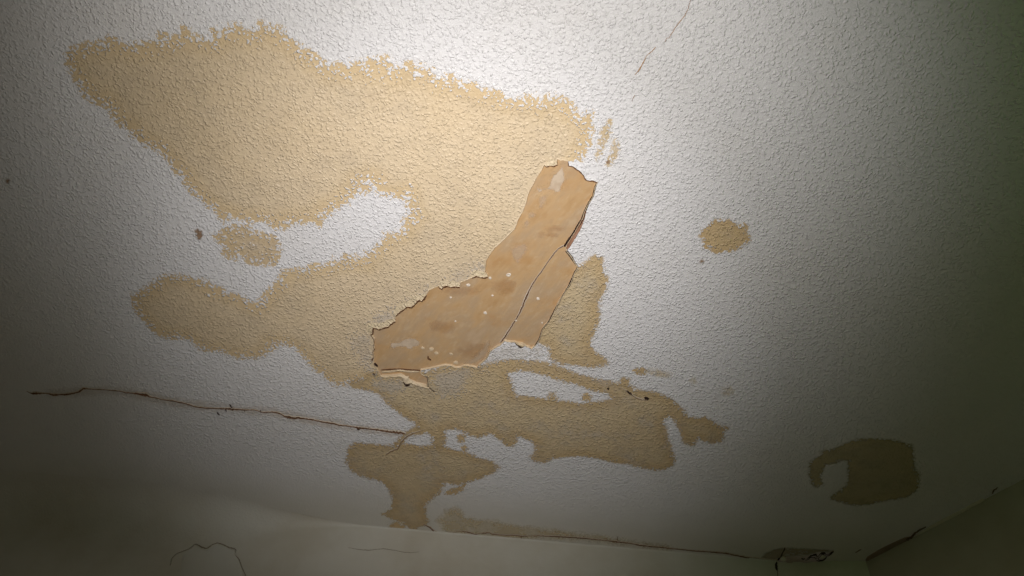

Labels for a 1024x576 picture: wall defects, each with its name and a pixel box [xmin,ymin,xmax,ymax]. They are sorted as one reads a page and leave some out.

damp [698,219,750,254]
damp [62,19,728,529]
flaking render [366,158,599,392]
crack [27,387,425,456]
damp [809,438,919,505]